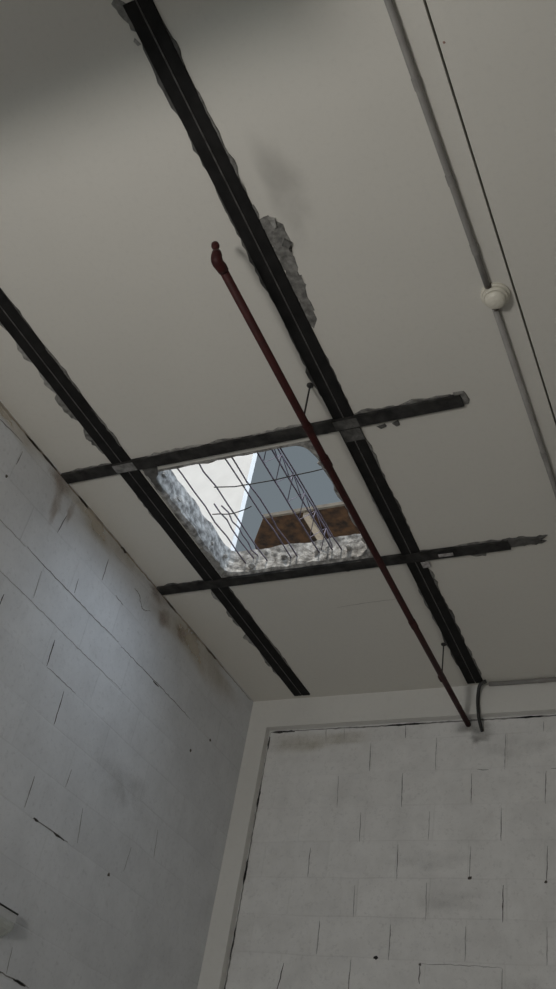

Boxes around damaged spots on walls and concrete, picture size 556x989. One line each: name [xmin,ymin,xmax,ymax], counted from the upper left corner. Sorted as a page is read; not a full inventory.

flaking render [259,215,317,328]
spalling [142,440,373,578]